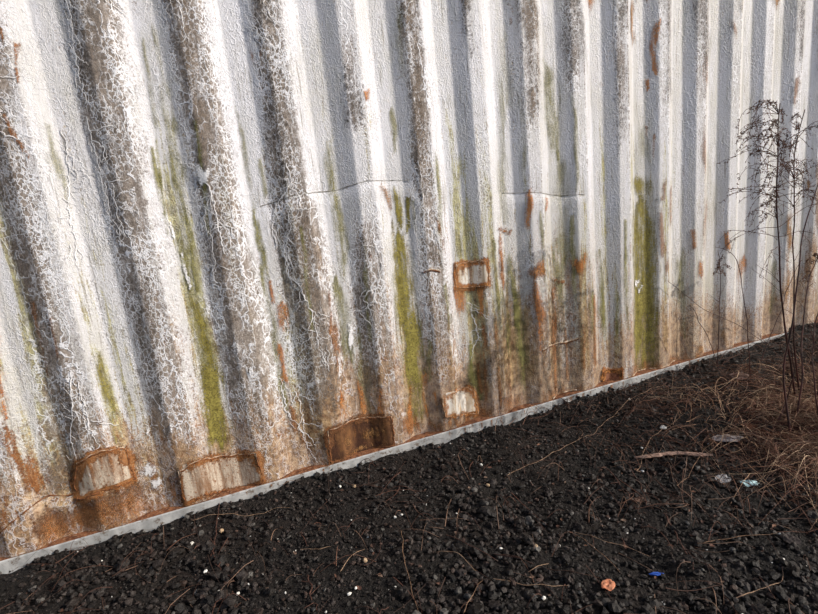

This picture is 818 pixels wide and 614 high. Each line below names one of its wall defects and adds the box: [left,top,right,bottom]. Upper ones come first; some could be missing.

corrosion [645,19,661,92]
water stain [151,140,166,214]
water stain [163,0,242,328]
water stain [257,0,353,416]
water stain [393,188,416,233]
corrosion [525,190,534,229]
water stain [634,175,652,198]
water stain [0,109,96,499]
corrosion [323,227,512,471]
corrosion [527,261,570,388]
corrosion [0,377,50,497]
corrosion [30,445,272,546]